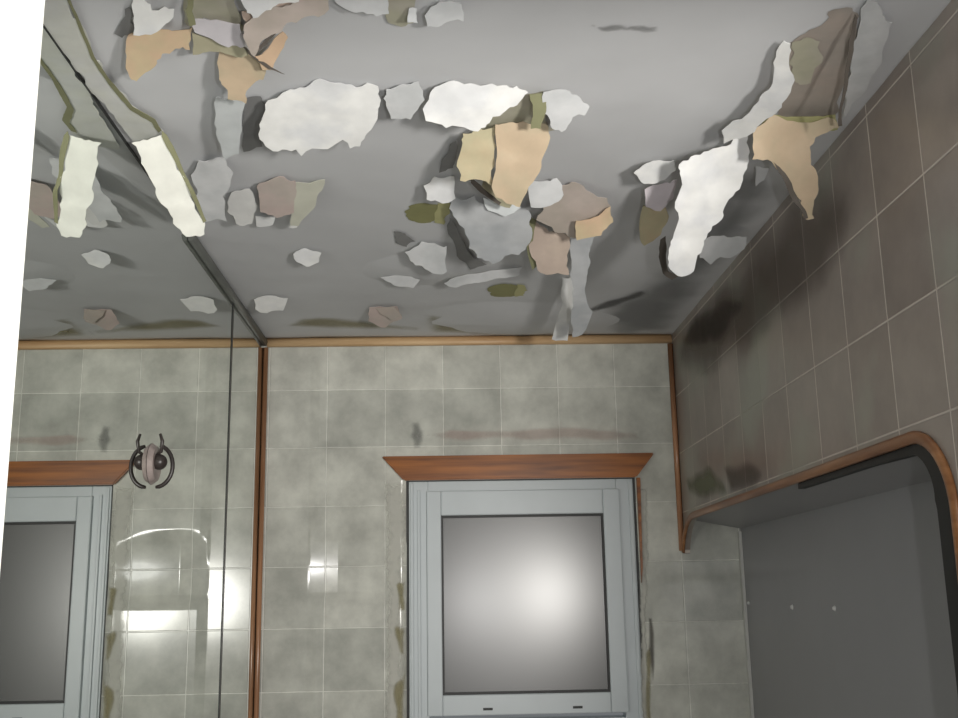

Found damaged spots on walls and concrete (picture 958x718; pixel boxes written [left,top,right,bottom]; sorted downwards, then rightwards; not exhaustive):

peeling [43,0,613,341]
peeling [634,0,892,280]